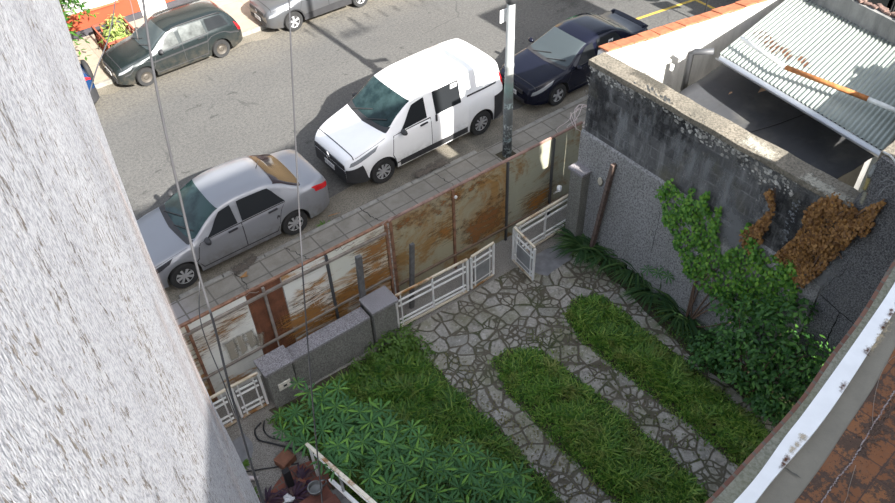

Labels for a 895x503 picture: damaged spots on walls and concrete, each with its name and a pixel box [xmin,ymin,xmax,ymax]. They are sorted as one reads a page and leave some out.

corrosion [753,30,808,68]
damp [586,64,715,180]
damp [714,171,820,251]
corrosion [183,305,252,411]